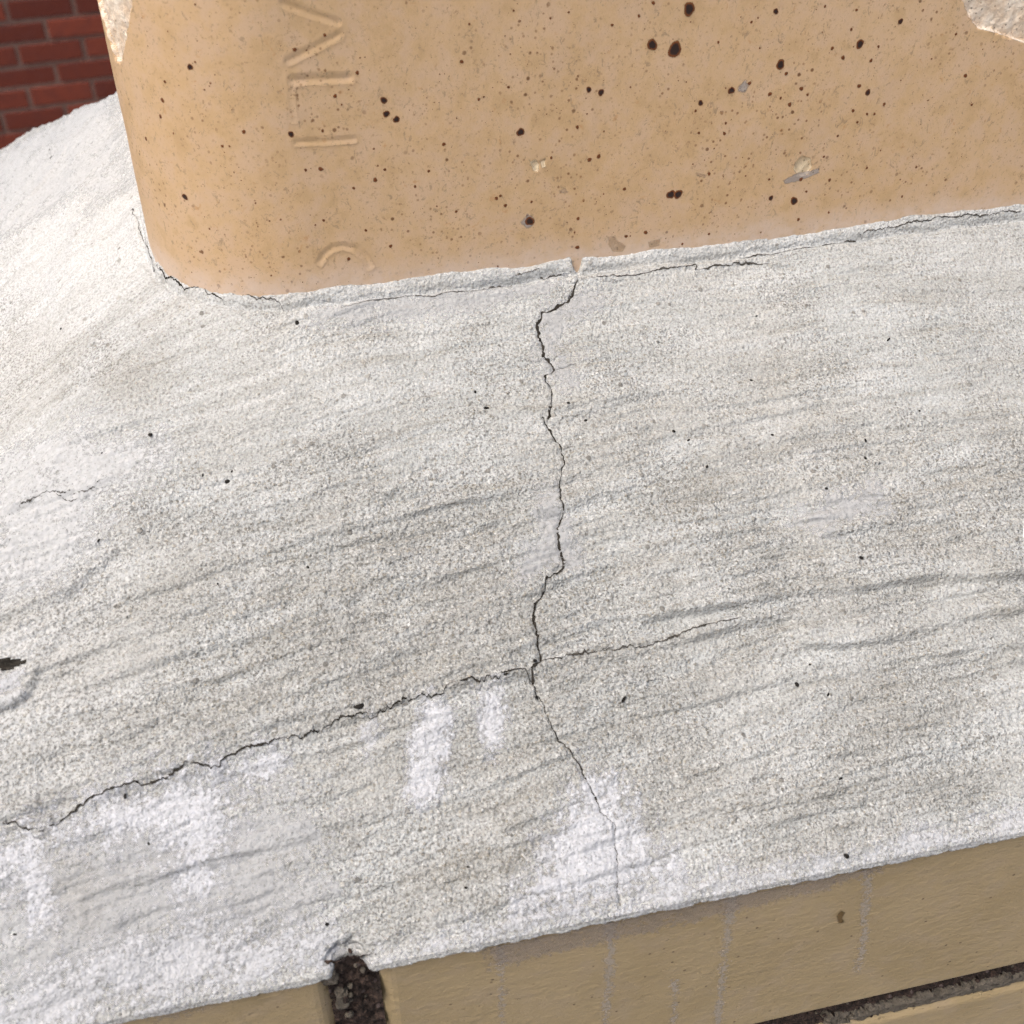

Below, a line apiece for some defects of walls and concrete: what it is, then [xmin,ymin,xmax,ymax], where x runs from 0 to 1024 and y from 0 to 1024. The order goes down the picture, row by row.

crack [3,208,1021,899]